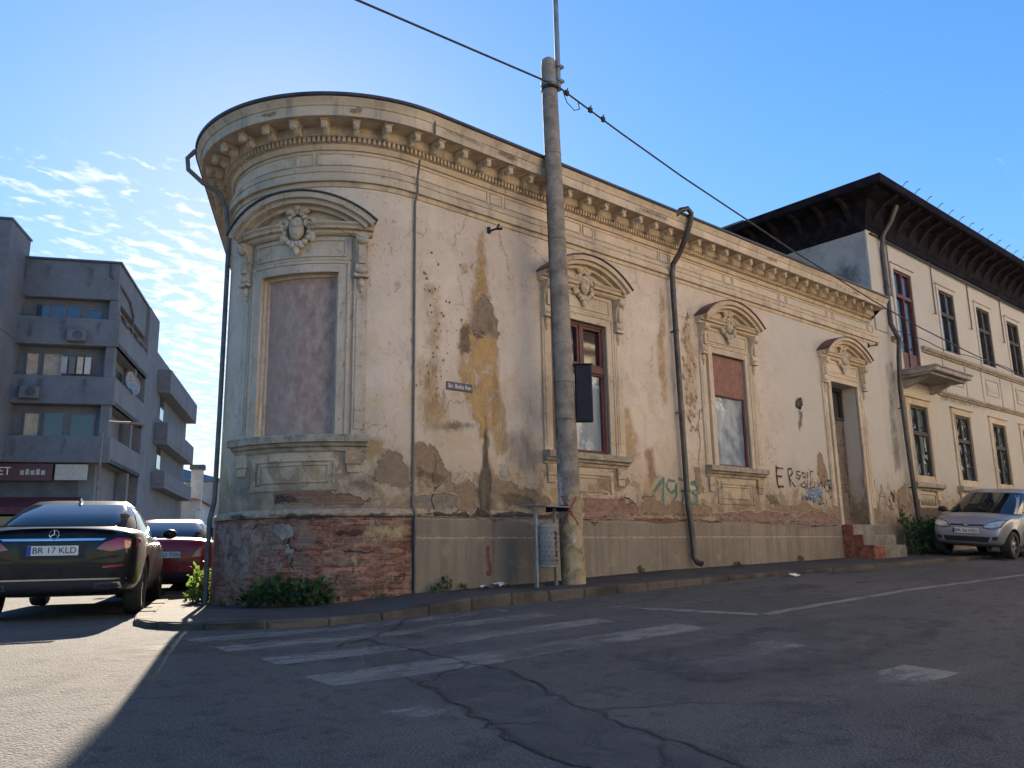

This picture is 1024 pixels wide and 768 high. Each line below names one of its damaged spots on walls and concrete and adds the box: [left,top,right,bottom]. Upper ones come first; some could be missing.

spalling [418,262,501,340]
leakage [459,236,507,521]
leakage [658,320,666,387]
spalling [372,440,478,516]
spalling [491,464,552,515]
spalling [583,467,840,527]